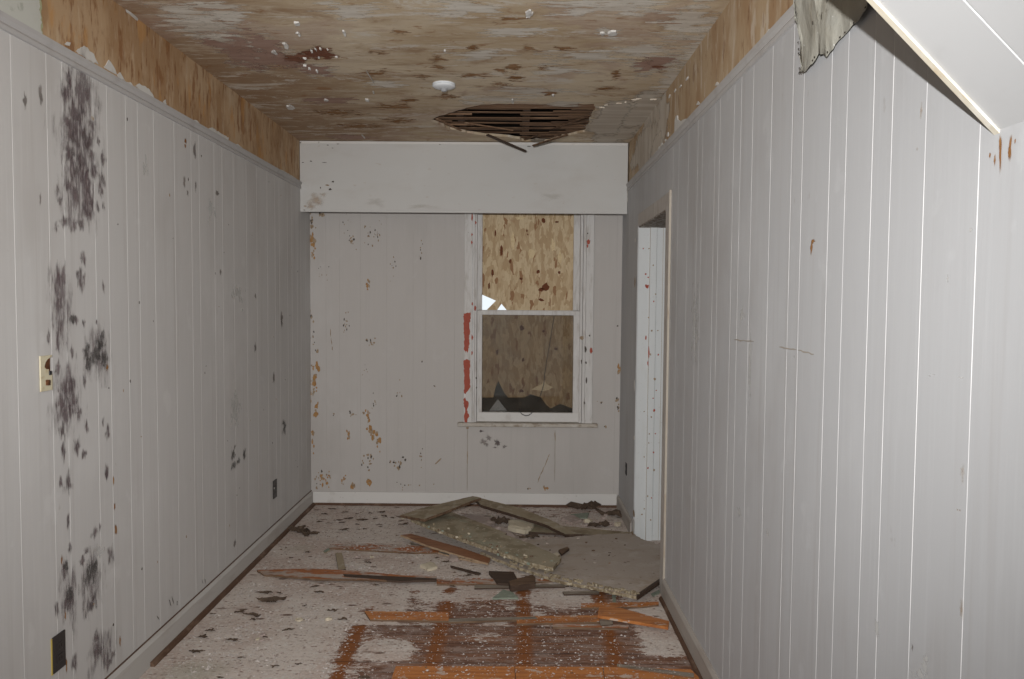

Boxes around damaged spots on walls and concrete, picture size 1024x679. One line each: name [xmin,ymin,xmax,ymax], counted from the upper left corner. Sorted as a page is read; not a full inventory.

damp [122,0,251,42]
damp [291,0,721,139]
damp [56,71,105,231]
rust [989,137,1016,168]
damp [47,254,108,460]
peeling [310,310,320,417]
peeling [314,393,381,489]
damp [55,544,114,629]
damp [93,634,114,671]